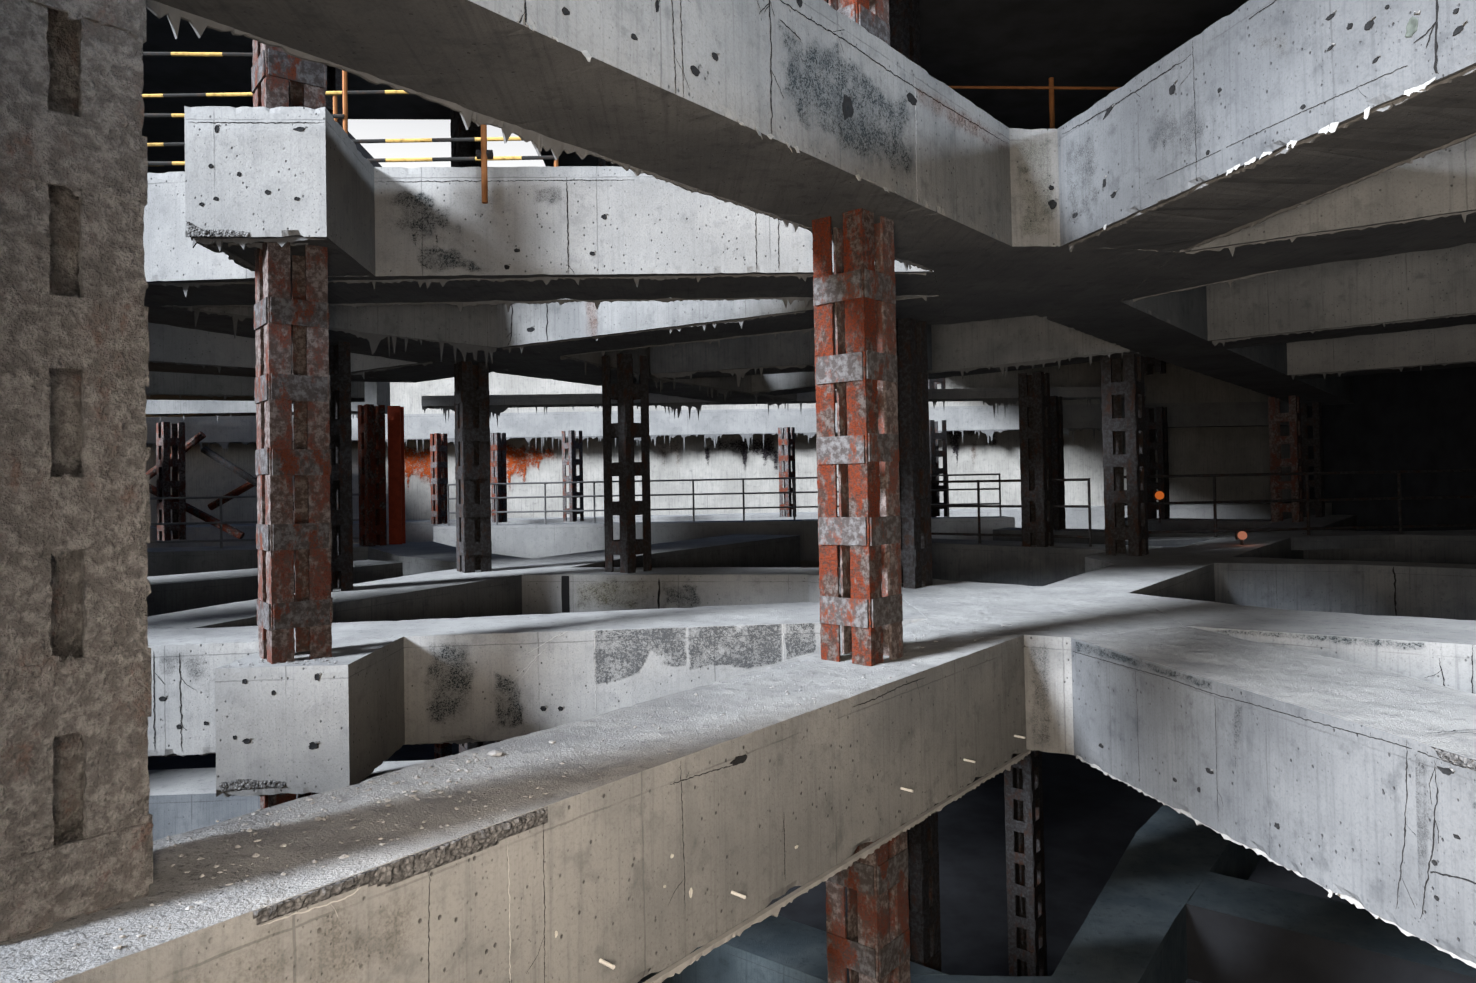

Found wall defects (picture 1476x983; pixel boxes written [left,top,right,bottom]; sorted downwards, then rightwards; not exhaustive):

crack [519,0,527,25]
water stain [779,26,910,173]
crack [1063,0,1439,180]
corrosion [404,447,431,487]
corrosion [490,444,554,483]
peeling [594,623,816,684]
crack [1073,645,1476,919]